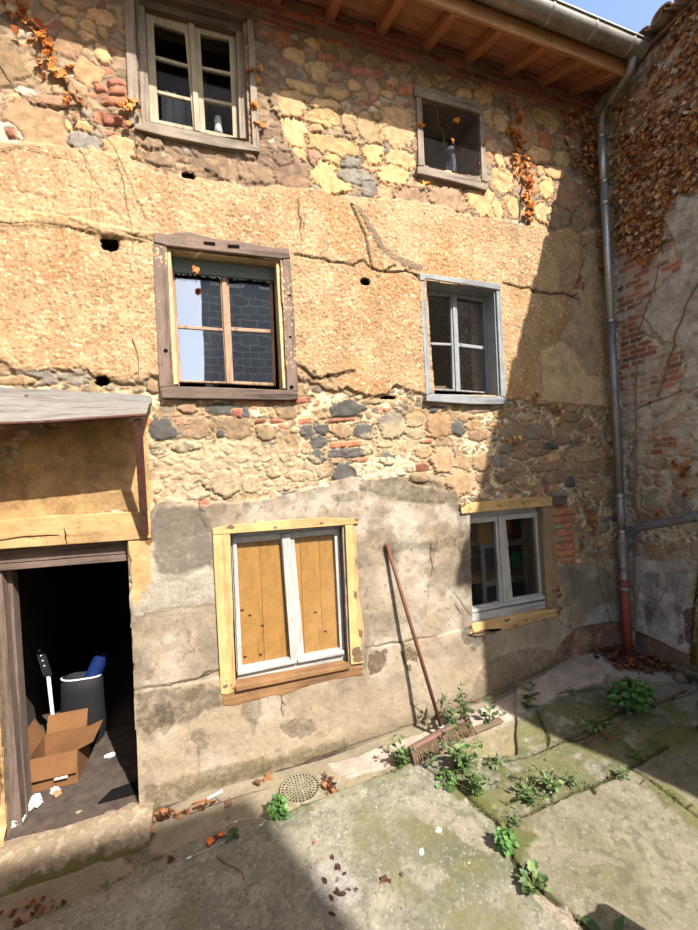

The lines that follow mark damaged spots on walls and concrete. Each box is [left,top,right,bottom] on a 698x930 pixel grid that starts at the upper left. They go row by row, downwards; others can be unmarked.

crack [297,204,423,278]